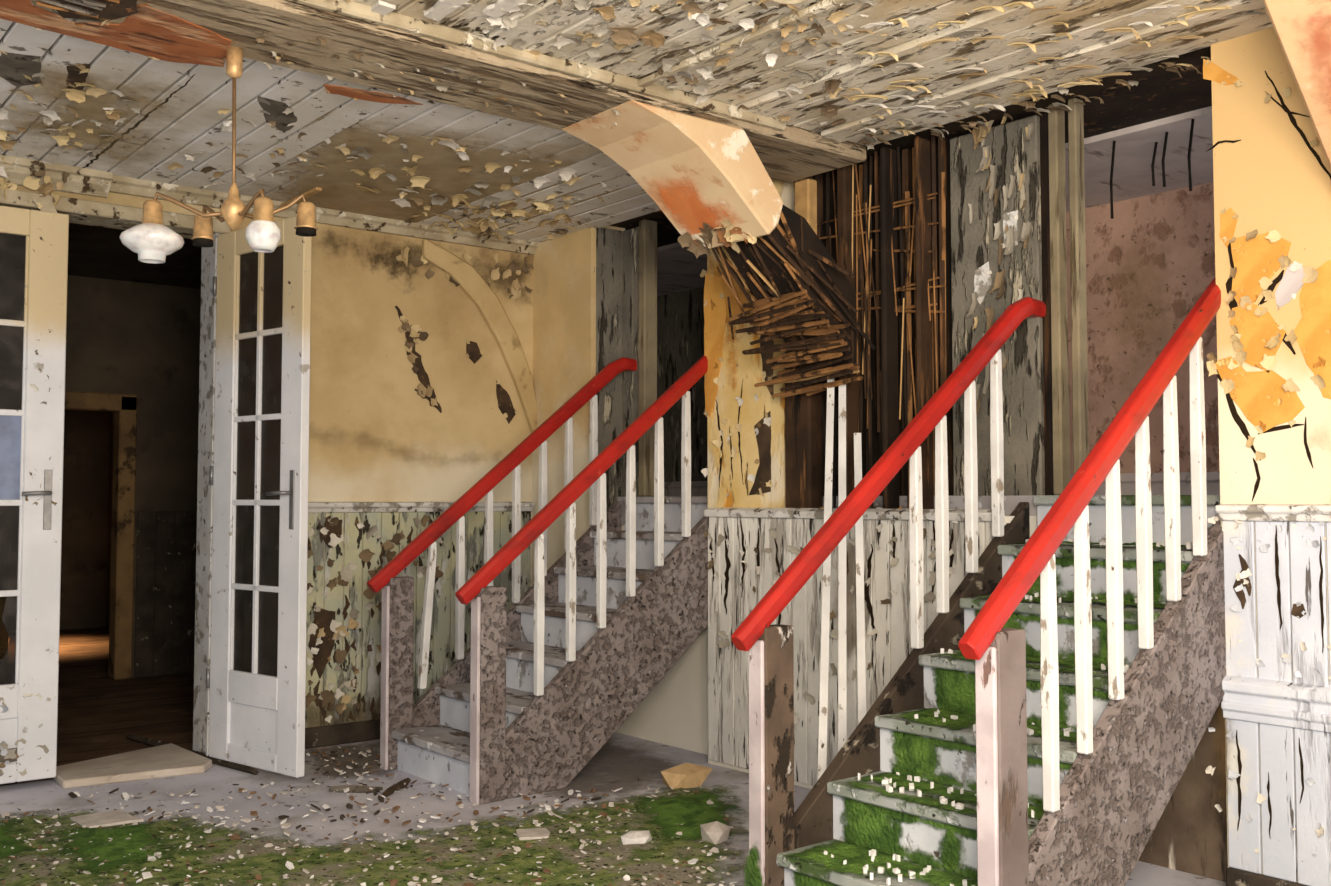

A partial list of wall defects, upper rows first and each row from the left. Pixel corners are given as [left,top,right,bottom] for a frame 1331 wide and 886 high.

peeling [0,50,141,218]
peeling [0,0,236,67]
peeling [167,96,613,300]
peeling [255,32,620,129]
peeling [423,0,1266,337]
crack [1206,140,1241,152]
crack [1264,71,1331,179]
peeling [495,378,518,424]
peeling [305,514,430,723]
spalling [1208,516,1328,612]
peeling [1291,602,1309,620]
peeling [0,738,49,776]